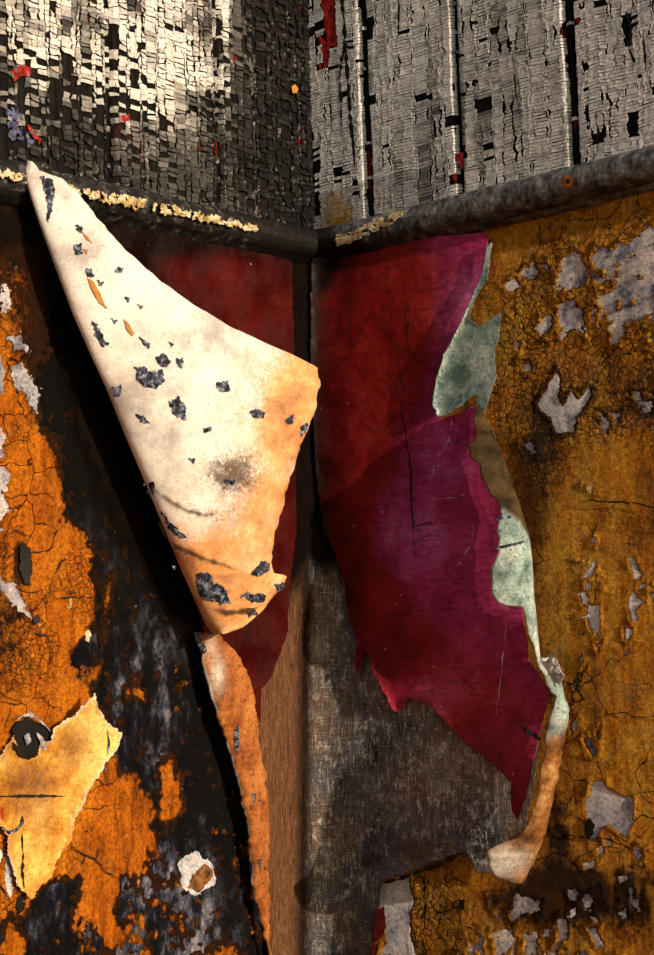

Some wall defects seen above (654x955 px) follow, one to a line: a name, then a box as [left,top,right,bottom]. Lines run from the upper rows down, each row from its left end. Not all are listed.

peeling [0,168,27,184]
peeling [40,175,55,222]
peeling [68,184,258,232]
peeling [102,222,295,355]
peeling [503,224,654,344]
peeling [538,373,591,433]
peeling [285,210,549,820]
crack [576,499,654,526]
flaking render [0,253,297,955]
crack [605,698,654,718]
crack [563,741,654,856]
peeling [467,889,604,955]